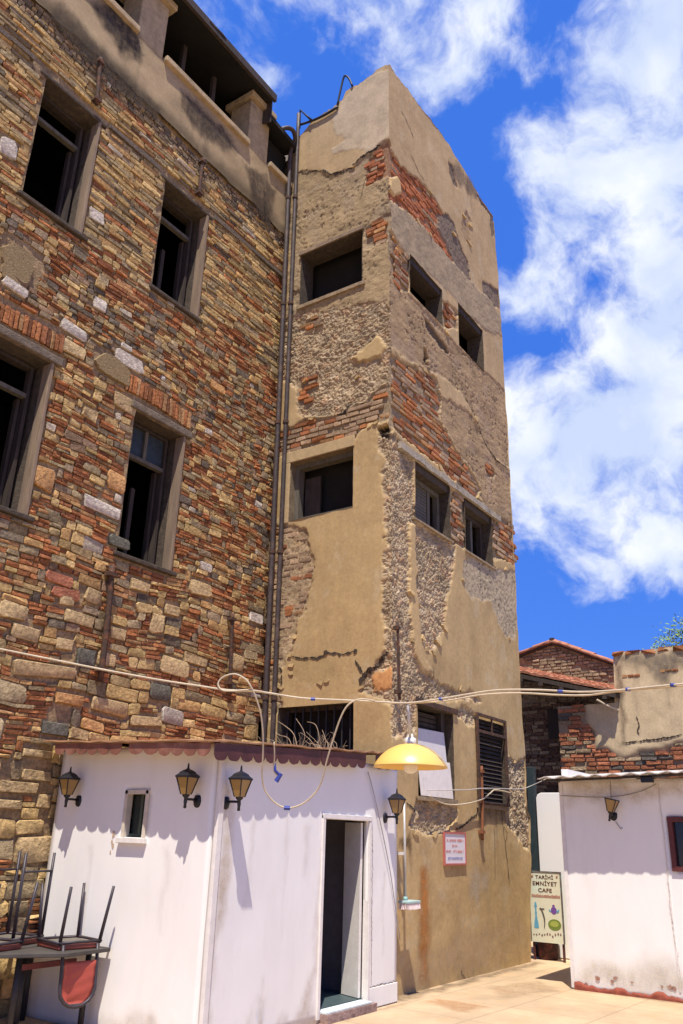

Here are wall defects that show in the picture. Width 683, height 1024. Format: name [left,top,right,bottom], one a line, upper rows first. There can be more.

water stain [184,96,232,148]
spalling [279,68,519,740]
spalling [259,523,315,721]
crack [279,649,389,691]
spalling [558,704,683,779]
spalling [409,797,458,838]
spalling [504,753,529,849]